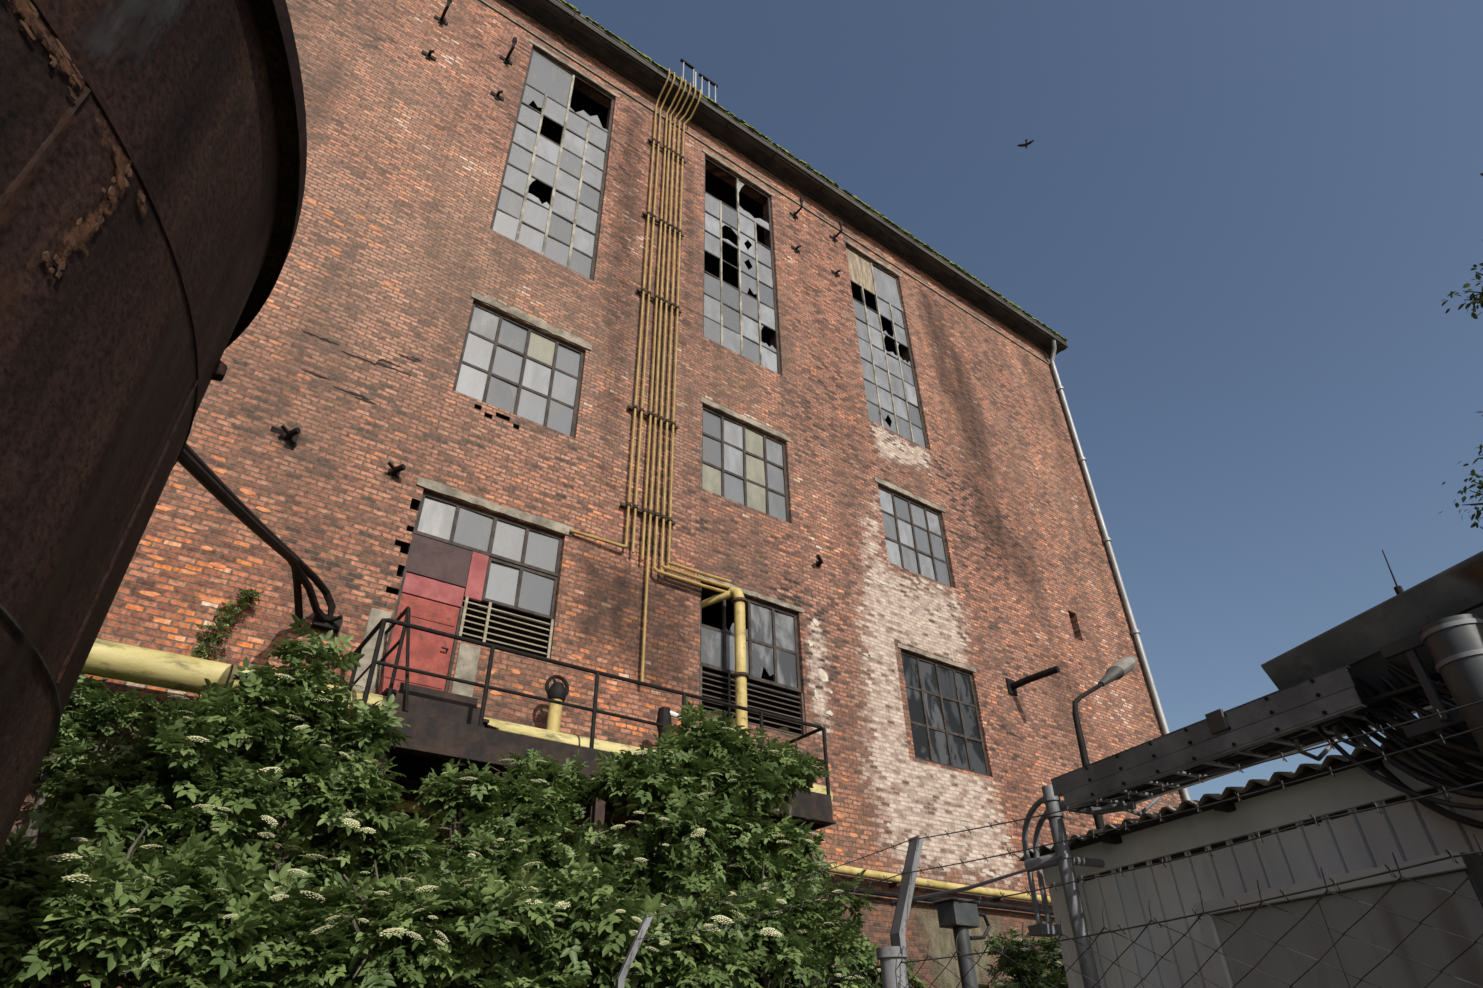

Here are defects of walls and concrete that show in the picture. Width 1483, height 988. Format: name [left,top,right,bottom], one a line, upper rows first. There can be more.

corrosion [7,0,85,100]
corrosion [42,118,147,279]
flaking render [806,618,834,736]
peeling [828,495,1021,886]